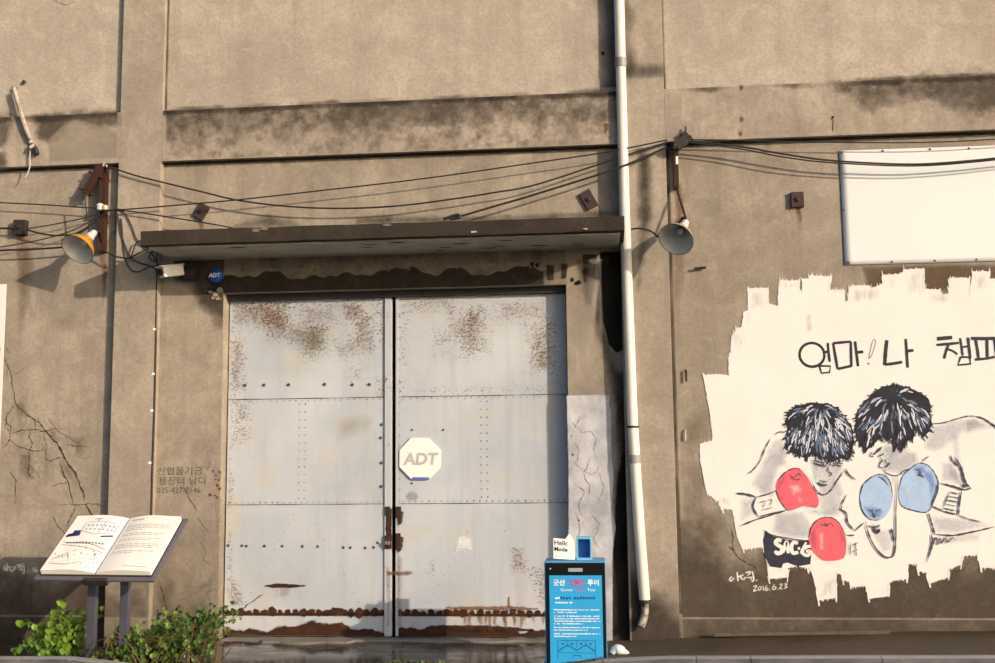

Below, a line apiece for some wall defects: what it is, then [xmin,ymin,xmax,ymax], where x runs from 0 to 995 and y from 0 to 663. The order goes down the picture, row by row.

peeling [208,243,597,300]
crack [3,349,108,534]
rust [223,580,384,636]
rust [398,597,545,637]